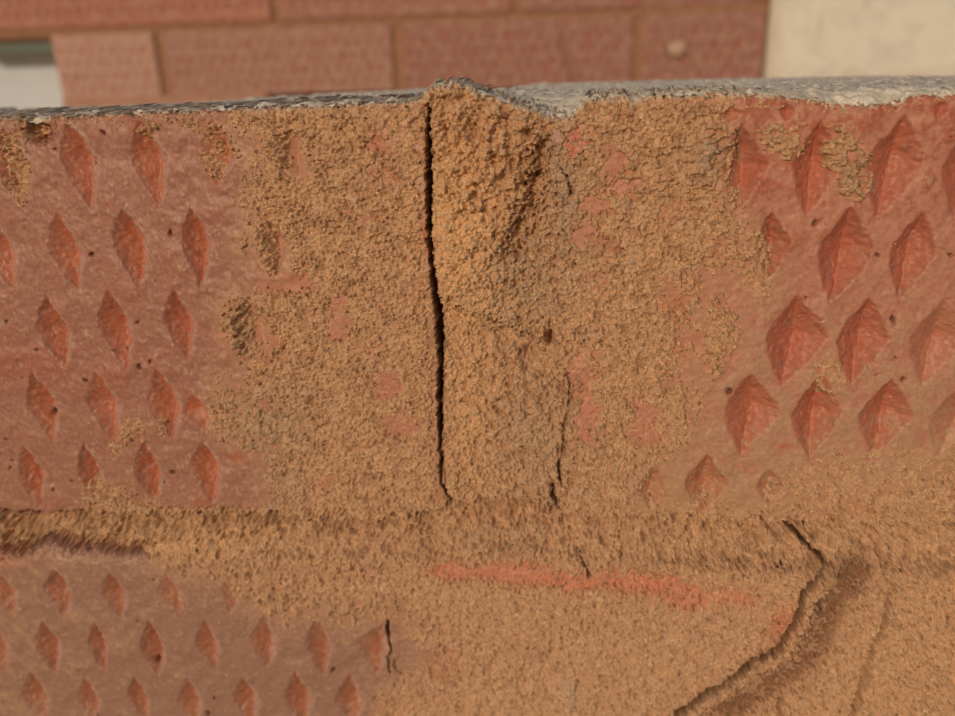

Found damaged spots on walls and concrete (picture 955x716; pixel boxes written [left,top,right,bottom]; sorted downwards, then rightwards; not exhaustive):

crack [422,102,452,505]
crack [549,372,572,510]
crack [668,520,830,716]